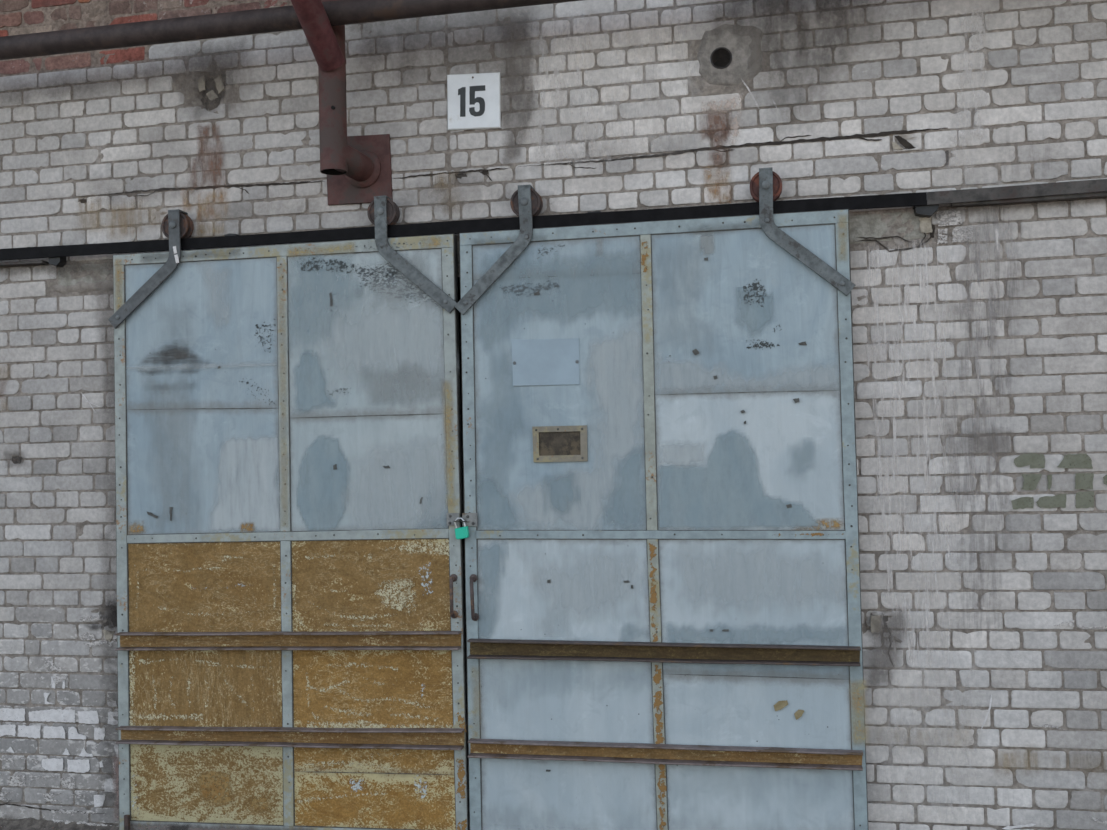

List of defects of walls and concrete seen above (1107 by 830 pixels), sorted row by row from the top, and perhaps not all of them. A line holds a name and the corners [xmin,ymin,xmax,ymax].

corrosion [185,125,223,236]
corrosion [704,96,741,202]
peeling [0,660,118,827]